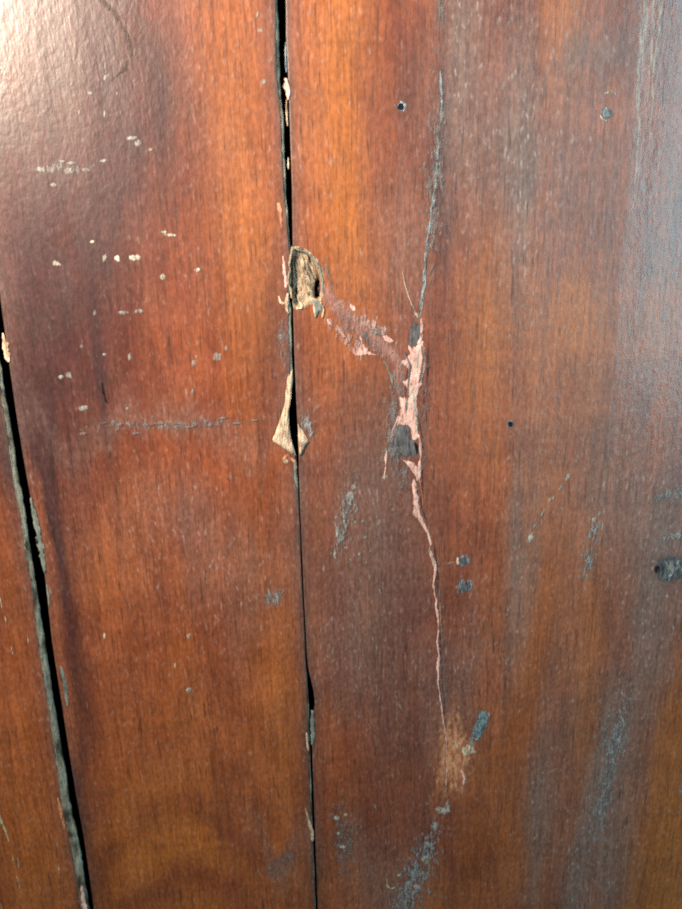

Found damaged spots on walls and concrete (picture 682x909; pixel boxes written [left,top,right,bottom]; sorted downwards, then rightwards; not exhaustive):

spalling [278,246,325,310]
crack [377,50,448,791]